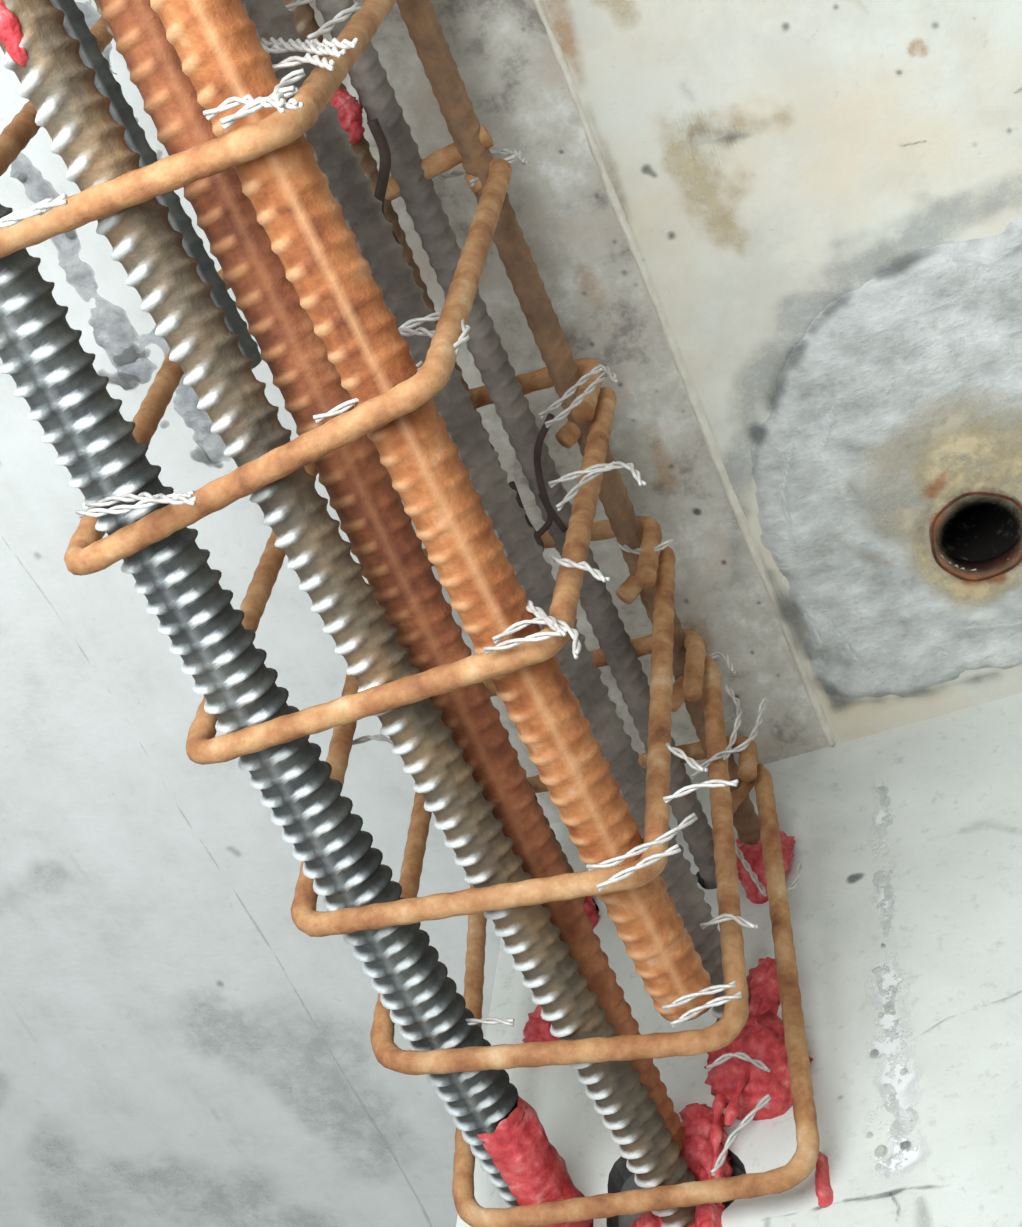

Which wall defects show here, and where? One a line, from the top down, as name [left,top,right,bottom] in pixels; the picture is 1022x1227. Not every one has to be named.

corrosion [555,21,574,55]
water stain [877,254,919,276]
water stain [749,425,764,442]
corrosion [869,400,1022,604]
water stain [779,597,811,658]
water stain [824,685,852,709]